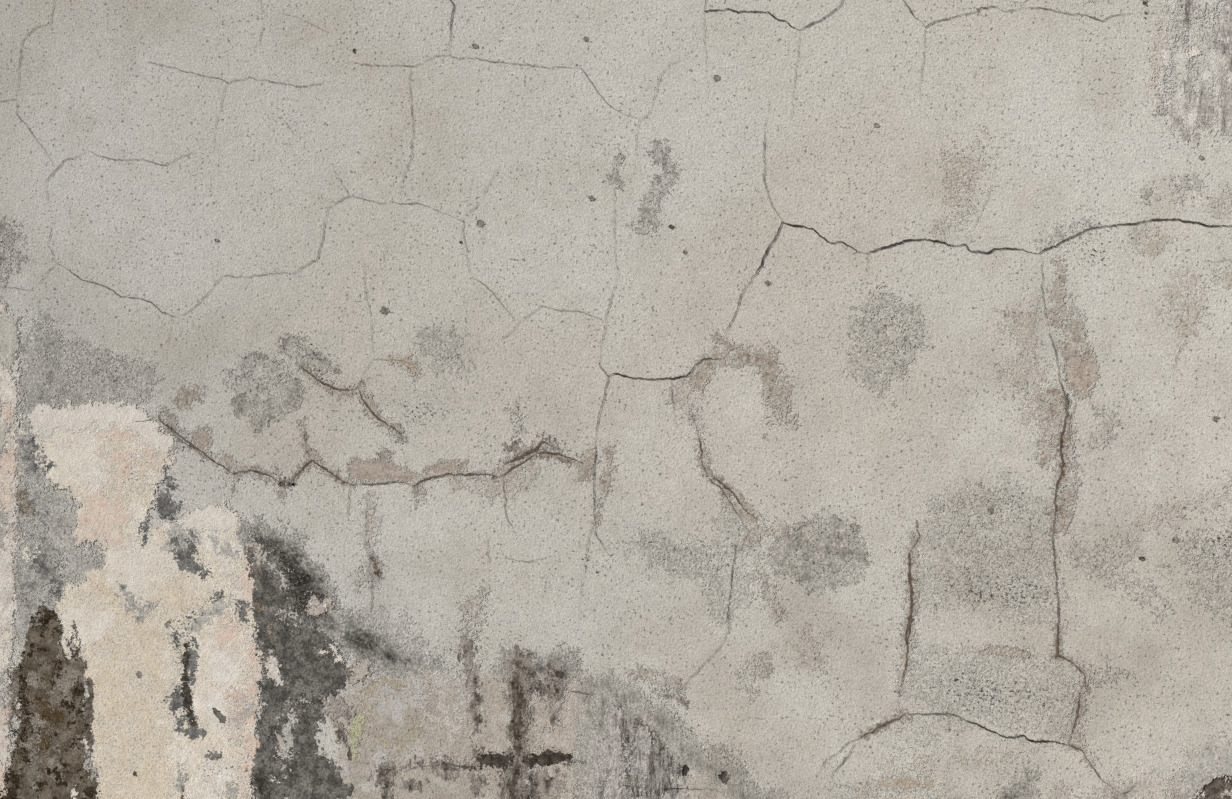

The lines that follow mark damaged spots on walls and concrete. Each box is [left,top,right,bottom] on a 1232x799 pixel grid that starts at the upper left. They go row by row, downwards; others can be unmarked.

crack [904,0,1133,96]
flaking render [1139,155,1212,212]
leakage [0,302,147,799]
peeling [0,215,267,799]
flaking render [220,331,341,437]
crack [2,0,843,695]
crack [724,106,1231,794]
flaking render [893,473,1232,752]
crack [403,764,472,772]
leakage [564,662,789,799]
flaking render [1051,753,1232,799]